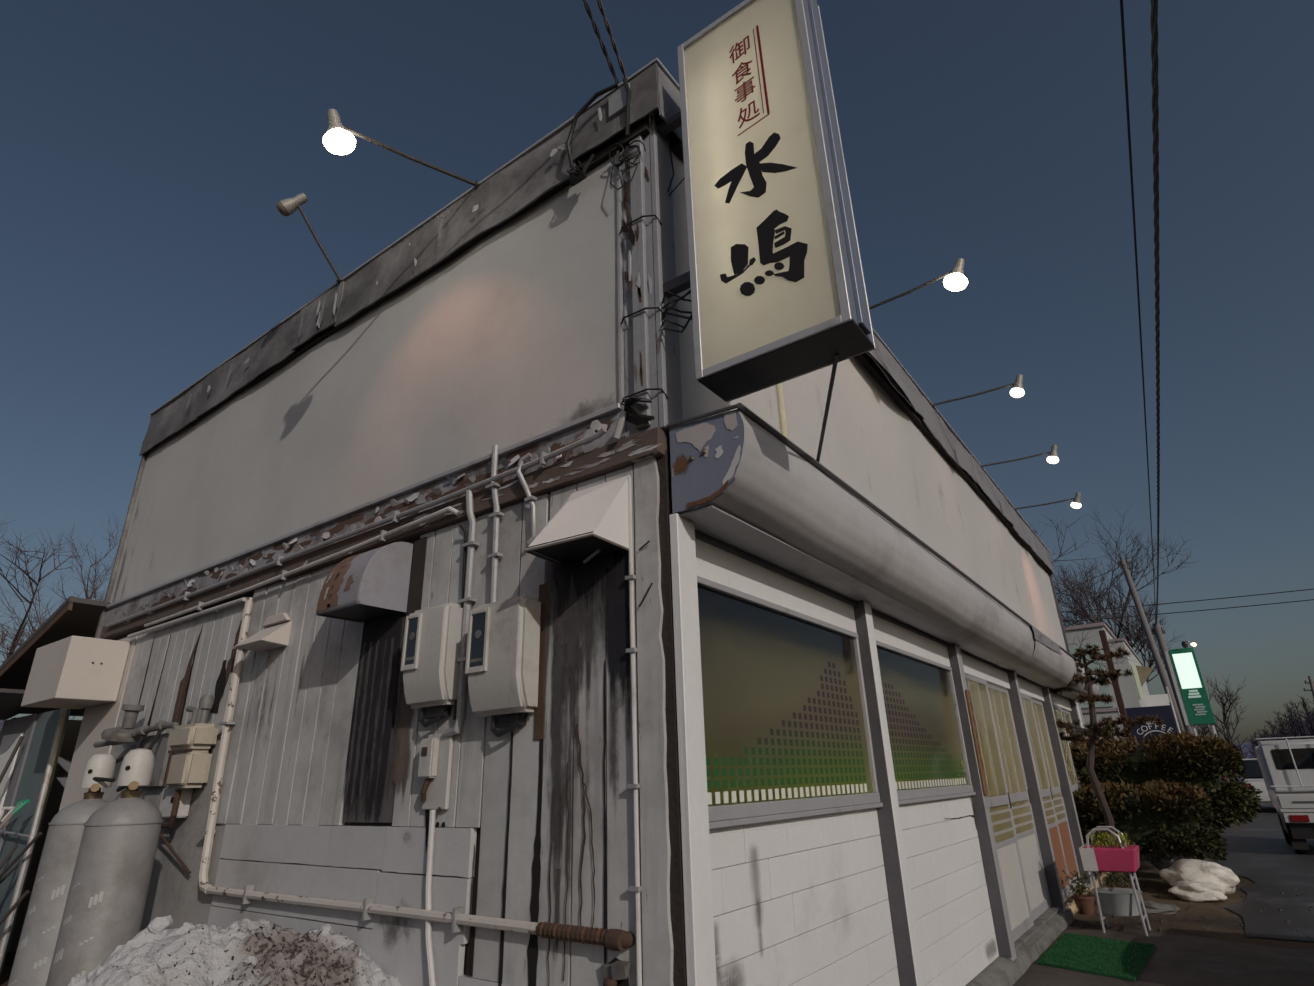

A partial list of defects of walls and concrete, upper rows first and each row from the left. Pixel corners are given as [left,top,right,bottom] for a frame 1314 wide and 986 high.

peeling [151,414,660,612]
peeling [676,411,741,485]
damp [544,549,630,924]
rust [539,922,609,946]